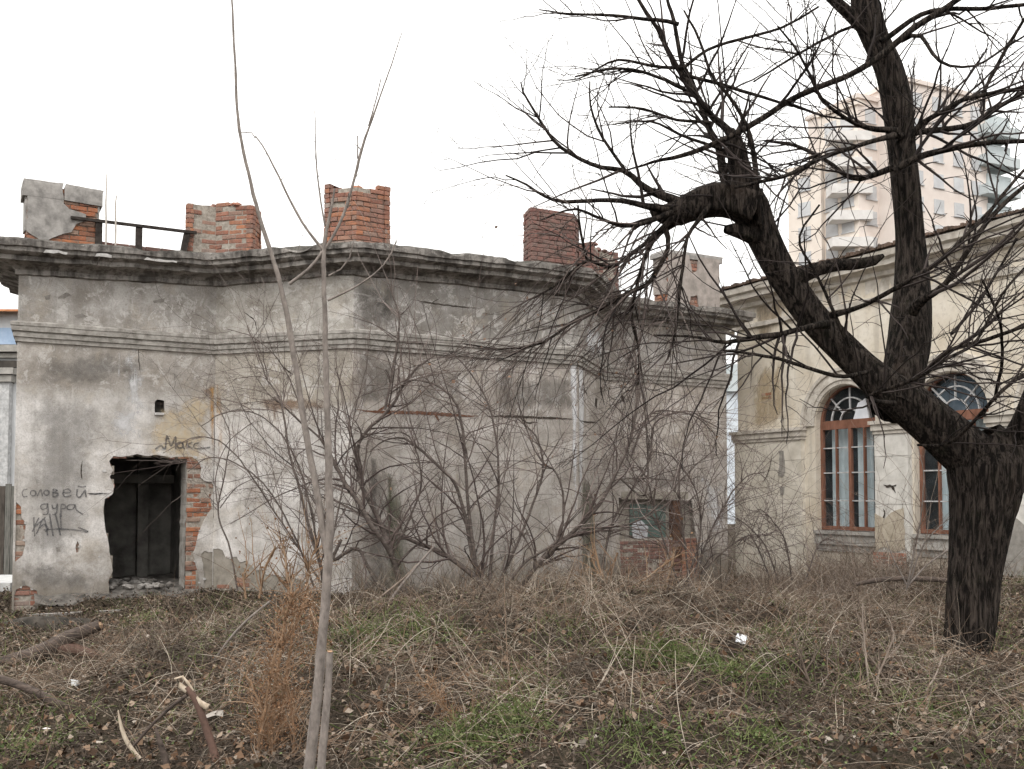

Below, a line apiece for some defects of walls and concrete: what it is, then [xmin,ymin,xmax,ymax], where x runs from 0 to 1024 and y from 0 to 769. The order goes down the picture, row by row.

spalling [15,502,28,561]
spalling [102,448,306,594]
flaking render [873,508,907,568]
spalling [14,581,37,612]